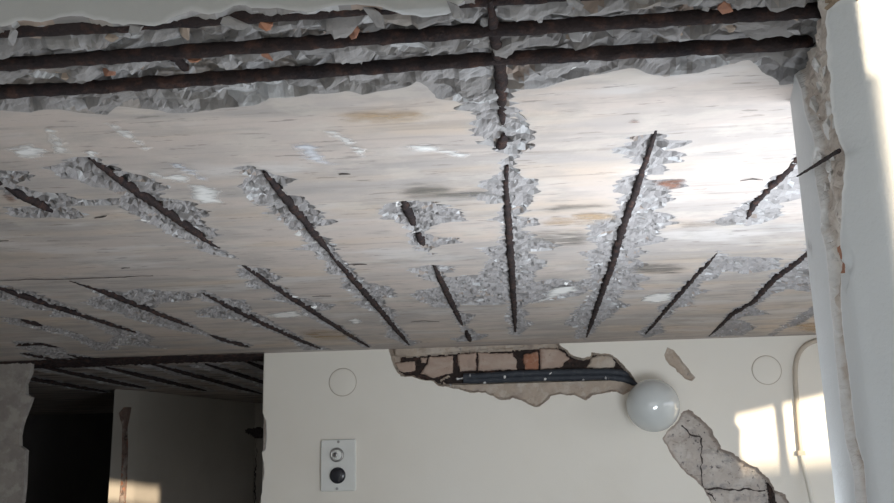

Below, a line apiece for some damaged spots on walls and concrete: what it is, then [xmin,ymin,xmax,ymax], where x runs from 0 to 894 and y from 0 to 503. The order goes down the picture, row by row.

flaking render [119,407,131,503]
spalling [0,277,333,395]
spalling [0,0,821,349]
flaking render [233,166,637,407]
flaking render [487,0,867,503]